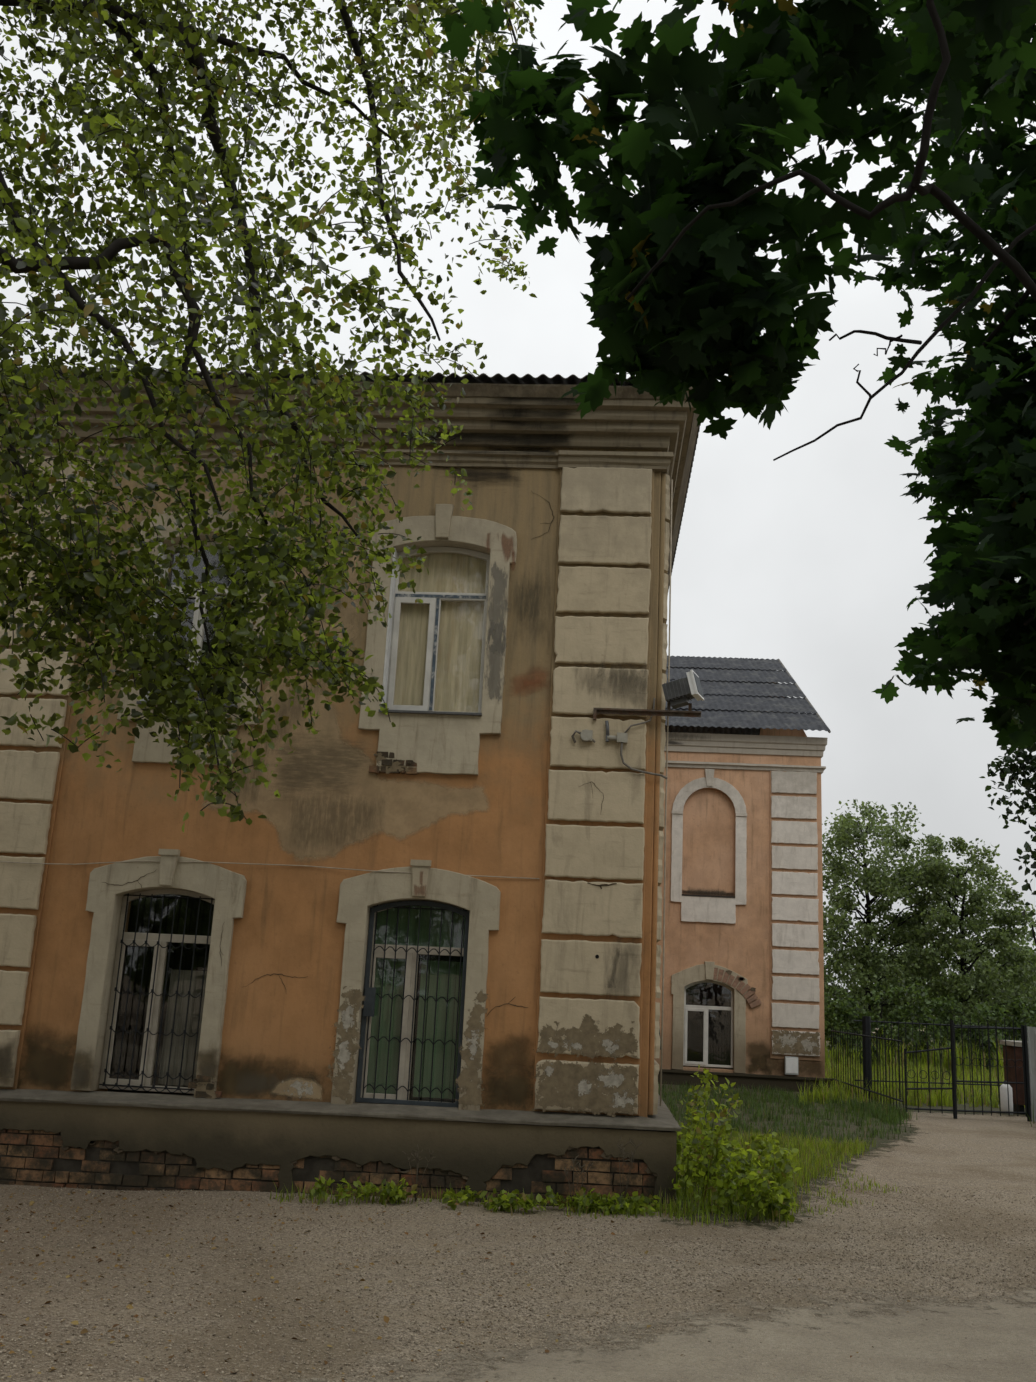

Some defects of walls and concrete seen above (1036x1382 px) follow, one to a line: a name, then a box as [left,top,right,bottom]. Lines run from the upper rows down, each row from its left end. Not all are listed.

leakage [395,397,576,481]
peeling [204,680,488,860]
crack [220,923,308,989]
peeling [273,986,366,1104]
peeling [455,989,488,1110]
peeling [532,1014,640,1118]